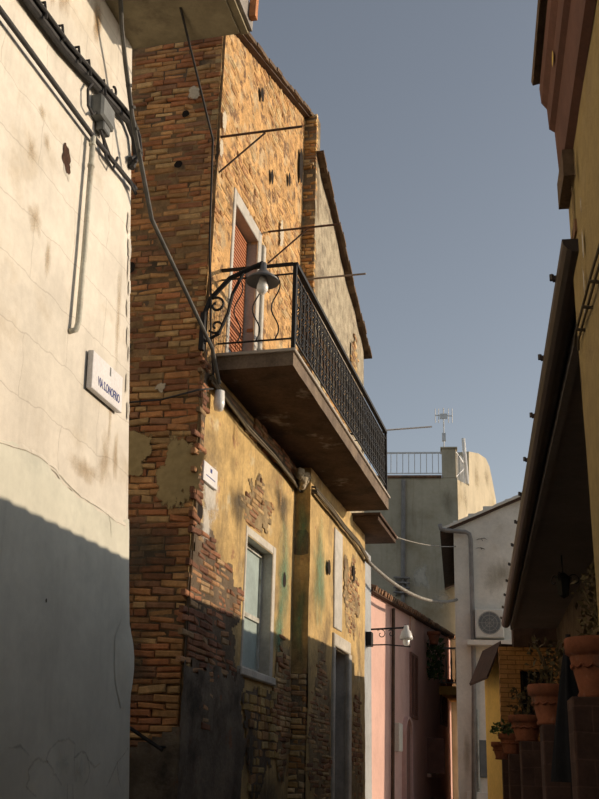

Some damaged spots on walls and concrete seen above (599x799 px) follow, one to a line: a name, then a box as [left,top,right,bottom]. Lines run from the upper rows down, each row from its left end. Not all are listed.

spalling [175,350,311,682]
spalling [342,554,360,640]
spalling [303,642,333,799]